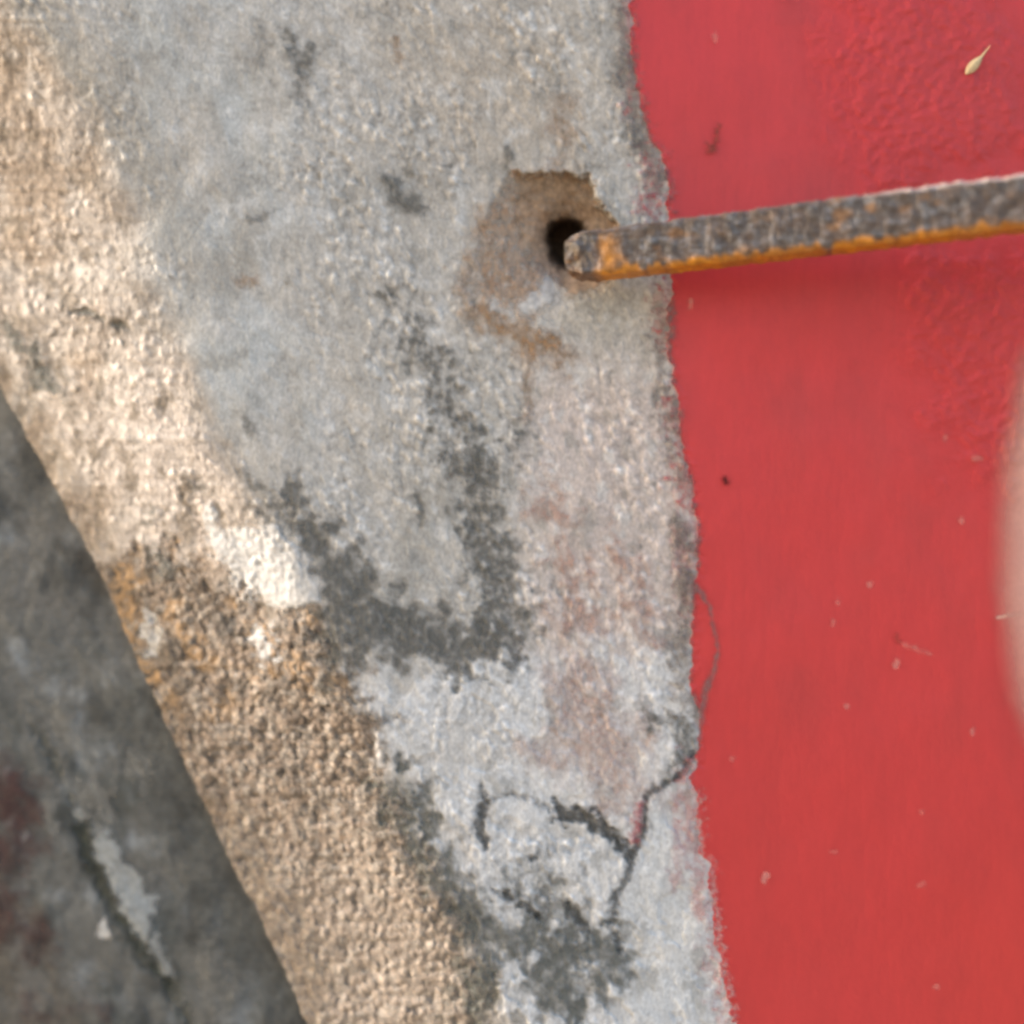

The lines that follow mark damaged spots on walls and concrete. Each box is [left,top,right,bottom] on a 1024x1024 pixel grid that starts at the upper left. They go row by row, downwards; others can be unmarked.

spalling [478,170,618,336]
corrosion [564,174,1024,283]
damp [203,315,531,683]
corrosion [486,315,565,364]
peeling [652,277,701,567]
peeling [693,583,719,745]
spalling [97,533,477,1024]
crack [475,785,490,848]
damp [369,753,636,1024]
crack [493,889,539,918]
crack [553,750,696,950]